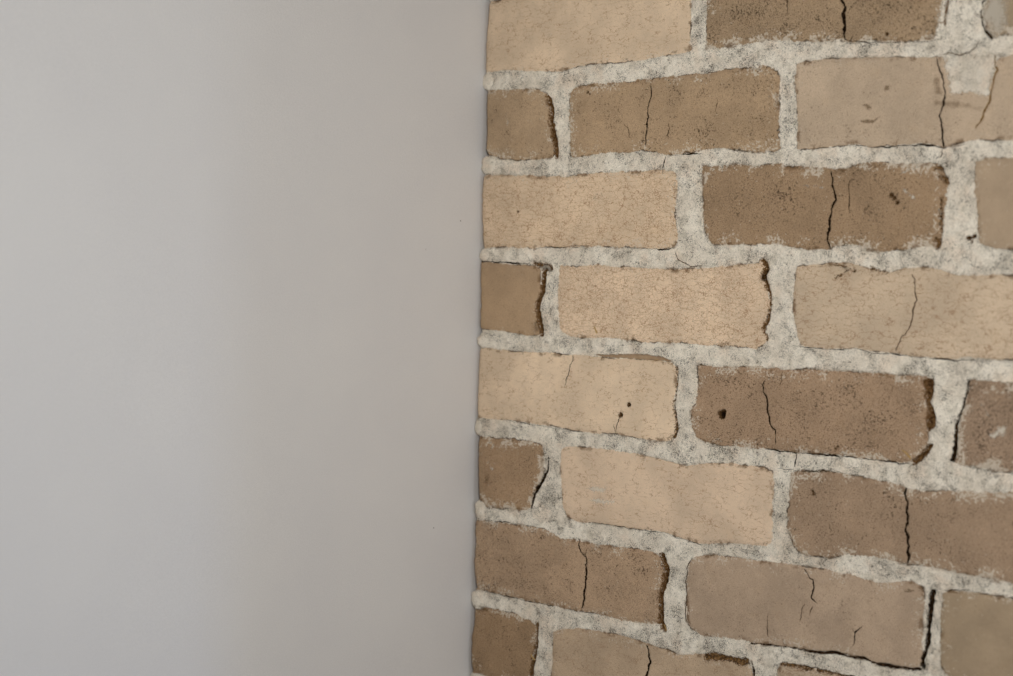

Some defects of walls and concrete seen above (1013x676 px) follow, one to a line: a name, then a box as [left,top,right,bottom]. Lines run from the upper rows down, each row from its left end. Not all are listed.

crack [801,0,998,156]
crack [623,90,701,174]
crack [827,172,851,250]
crack [797,275,975,362]
crack [762,372,913,476]
crack [903,488,911,562]
crack [578,539,588,608]
crack [599,523,700,621]